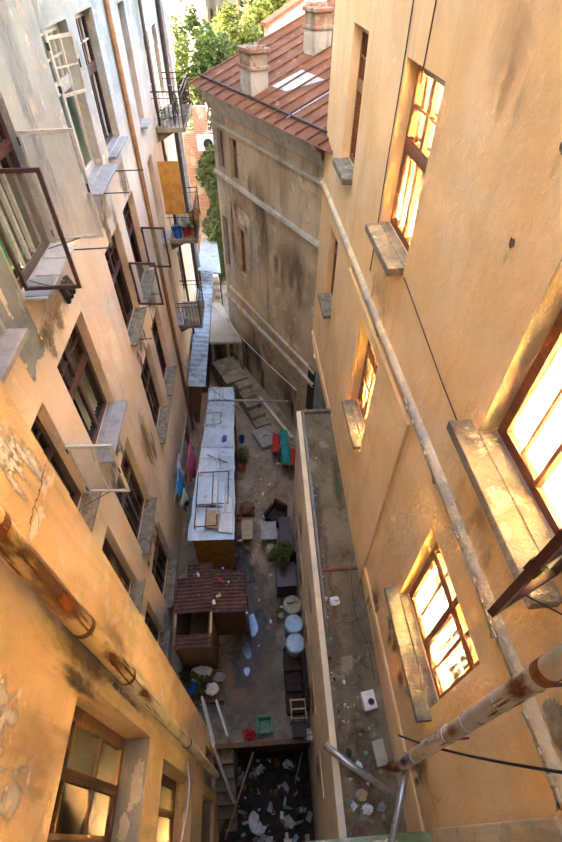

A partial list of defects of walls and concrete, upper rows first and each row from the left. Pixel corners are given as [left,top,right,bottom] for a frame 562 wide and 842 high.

peeling [0,250,59,382]
spalling [29,505,45,542]
crack [30,464,46,532]
corrosion [0,523,97,635]
peeling [0,674,26,735]
corrosion [490,674,529,716]
peeling [117,758,144,841]